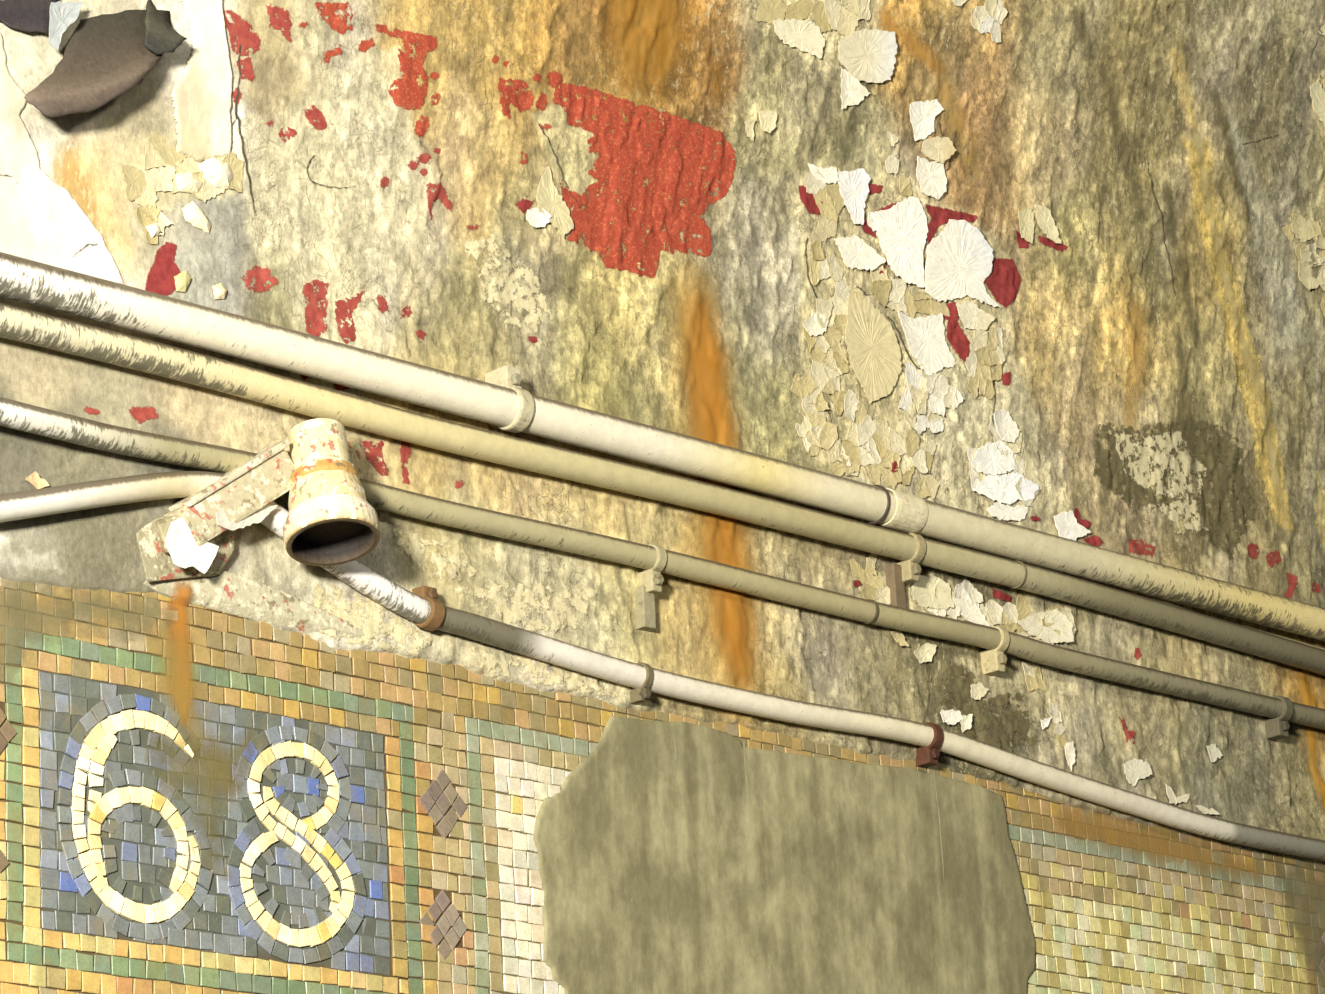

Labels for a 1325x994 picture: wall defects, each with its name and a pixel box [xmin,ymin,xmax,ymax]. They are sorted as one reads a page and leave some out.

peeling [755,0,898,109]
flaking render [0,32,125,285]
flaking render [122,0,441,296]
peeling [492,55,737,278]
corrosion [684,285,732,447]
peeling [790,99,1103,546]
corrosion [698,477,735,489]
corrosion [702,511,748,569]
corrosion [169,586,191,722]
corrosion [711,585,752,690]
peeling [911,574,1076,645]
corrosion [1307,726,1325,807]